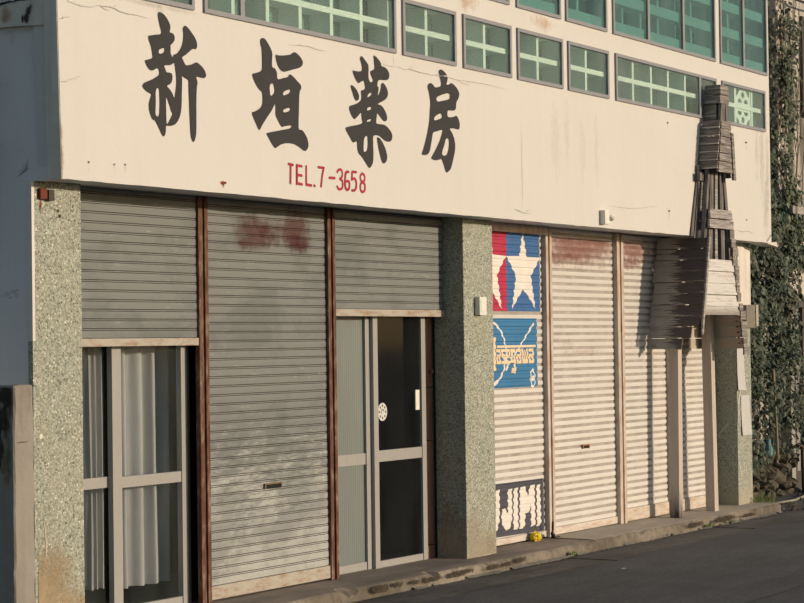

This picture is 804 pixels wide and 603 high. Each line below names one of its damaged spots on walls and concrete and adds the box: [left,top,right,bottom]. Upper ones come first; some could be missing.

crack [60,2,145,19]
crack [383,59,499,88]
leakage [0,388,12,467]